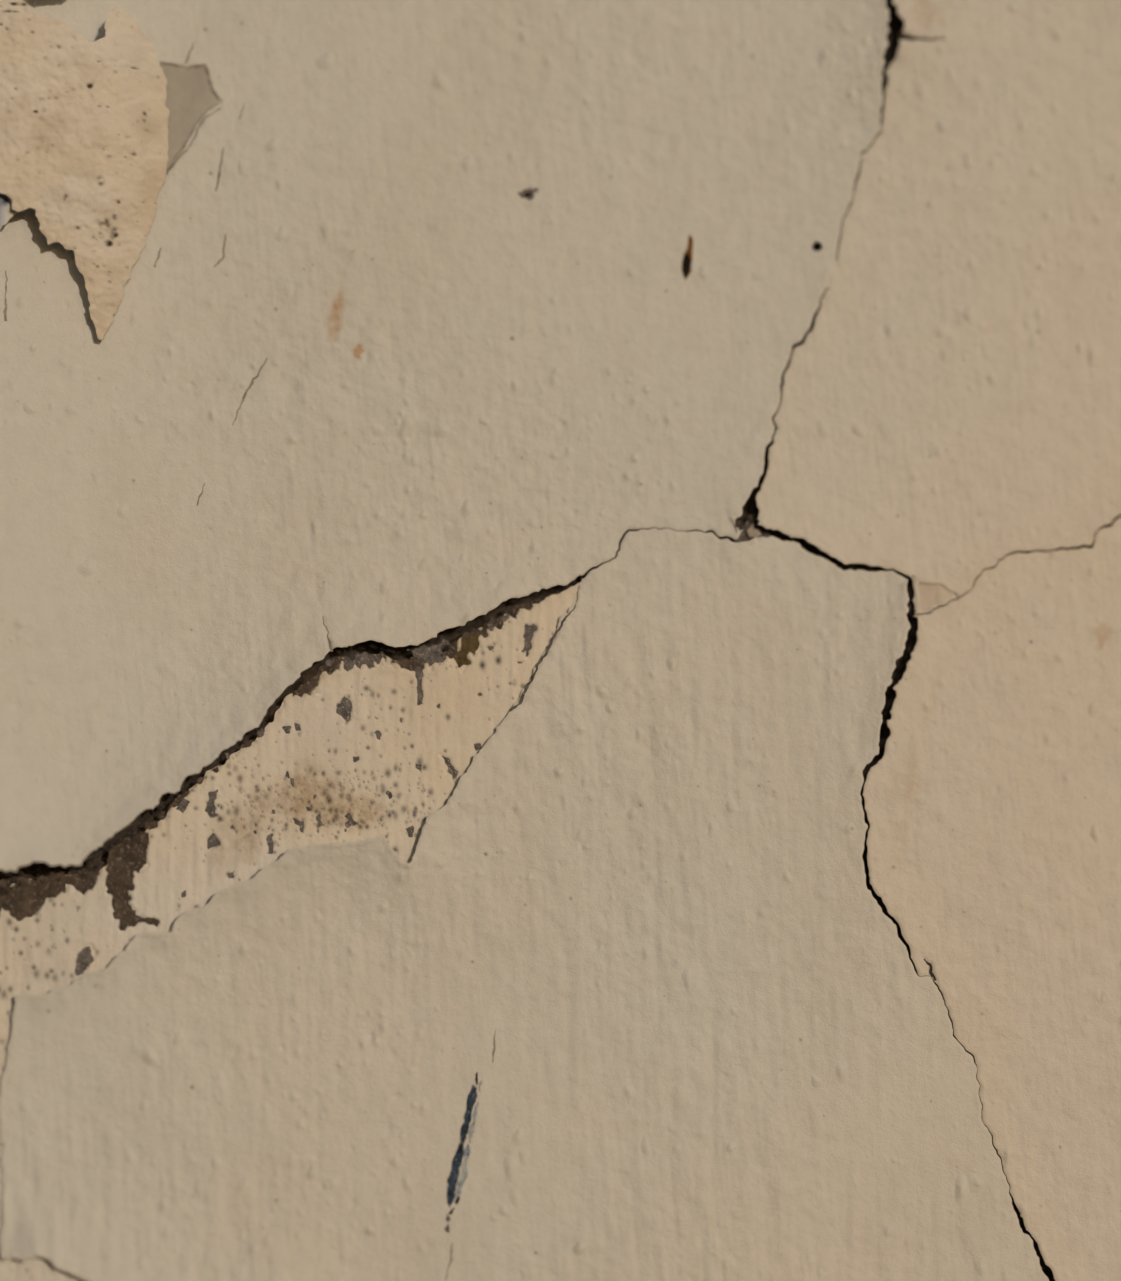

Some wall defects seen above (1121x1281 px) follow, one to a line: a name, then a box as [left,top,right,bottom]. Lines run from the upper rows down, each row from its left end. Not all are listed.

peeling [0,0,220,341]
corrosion [682,236,693,280]
crack [835,0,945,260]
peeling [0,582,581,1080]
crack [0,288,1121,1281]
peeling [0,1256,84,1281]
peeling [444,1072,482,1233]